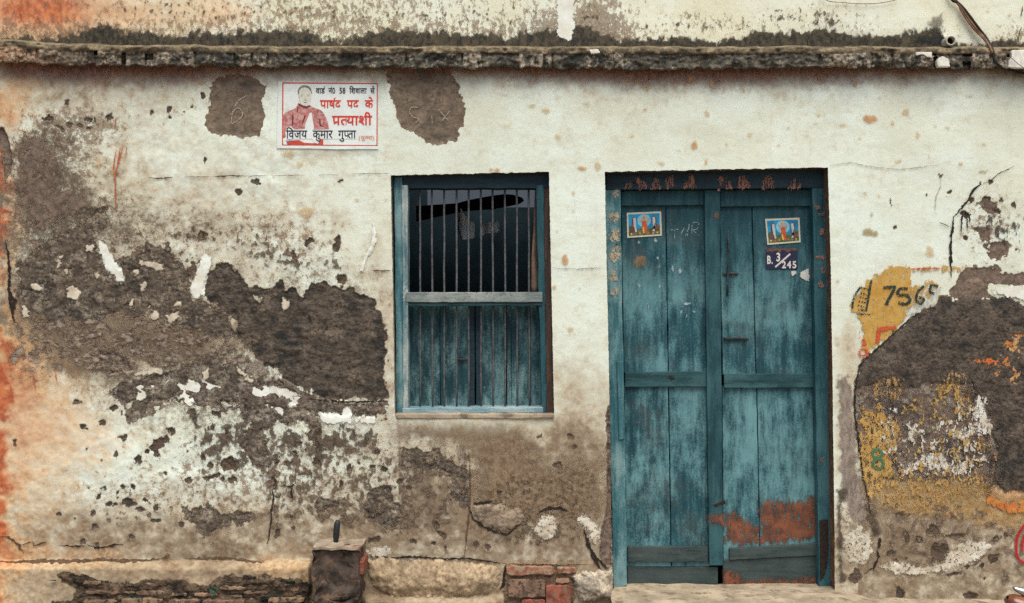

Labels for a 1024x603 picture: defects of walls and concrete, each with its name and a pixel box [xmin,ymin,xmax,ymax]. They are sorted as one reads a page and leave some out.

leakage [1,15,1024,47]
crack [831,162,1014,277]
spalling [0,113,470,551]
spalling [853,179,1024,492]
leakage [397,424,598,528]
spalling [848,568,877,583]
spalling [883,498,1023,598]